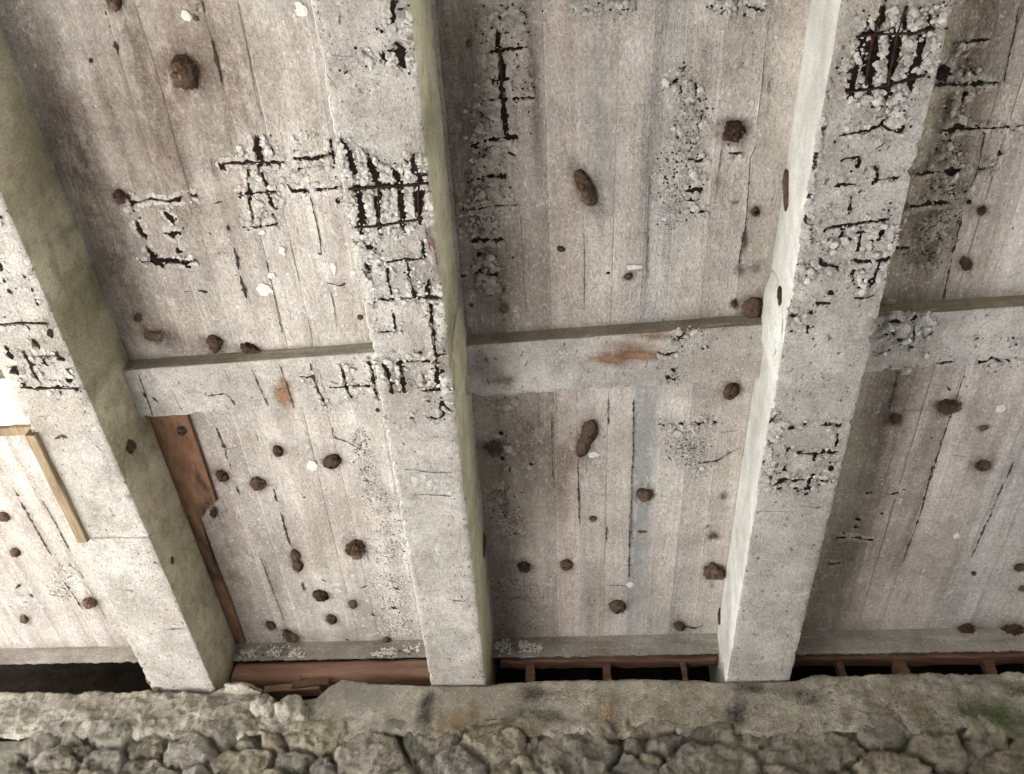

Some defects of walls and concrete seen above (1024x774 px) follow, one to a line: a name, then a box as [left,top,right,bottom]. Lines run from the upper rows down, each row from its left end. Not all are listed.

spalling [454,1,545,300]
spalling [648,61,715,230]
spalling [725,142,744,162]
spalling [784,0,1024,375]
spalling [0,262,84,398]
spalling [212,130,455,425]
rust [596,345,657,364]
spalling [758,411,846,499]